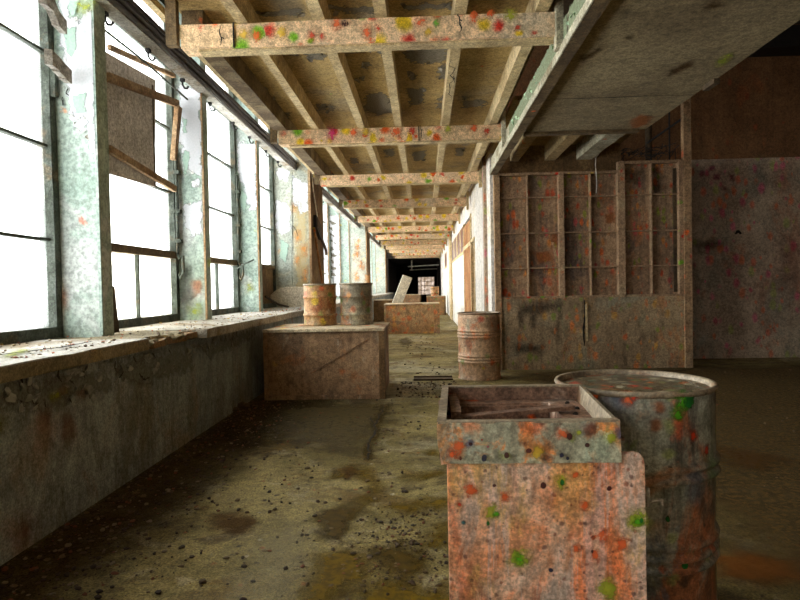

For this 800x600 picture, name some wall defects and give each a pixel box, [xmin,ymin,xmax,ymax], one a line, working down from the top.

peeling [50,0,95,159]
peeling [178,84,202,188]
peeling [182,200,203,237]
peeling [274,168,308,263]
crack [581,300,589,346]